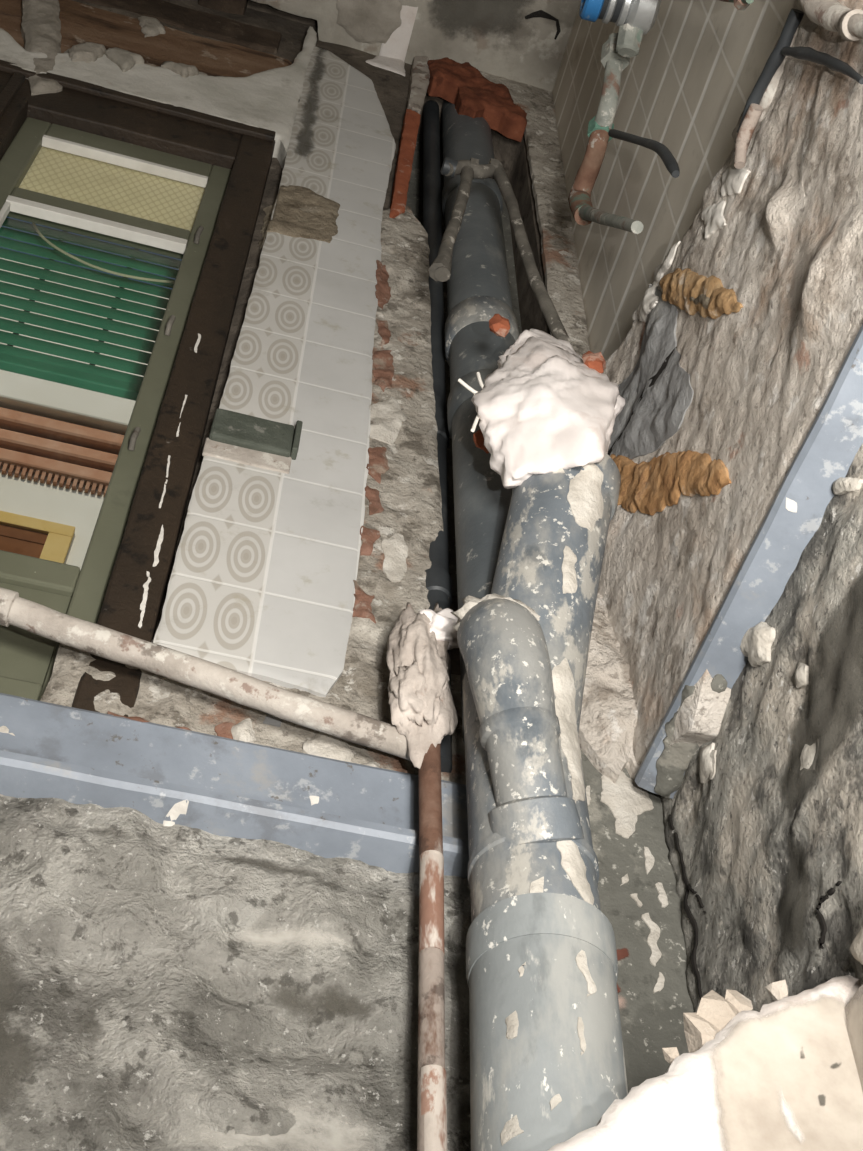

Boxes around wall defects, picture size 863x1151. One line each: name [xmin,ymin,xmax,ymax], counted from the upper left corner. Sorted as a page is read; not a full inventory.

leakage [432,0,528,35]
spalling [258,185,340,249]
spalling [360,260,408,582]
spalling [352,580,376,624]
crack [668,814,706,1001]